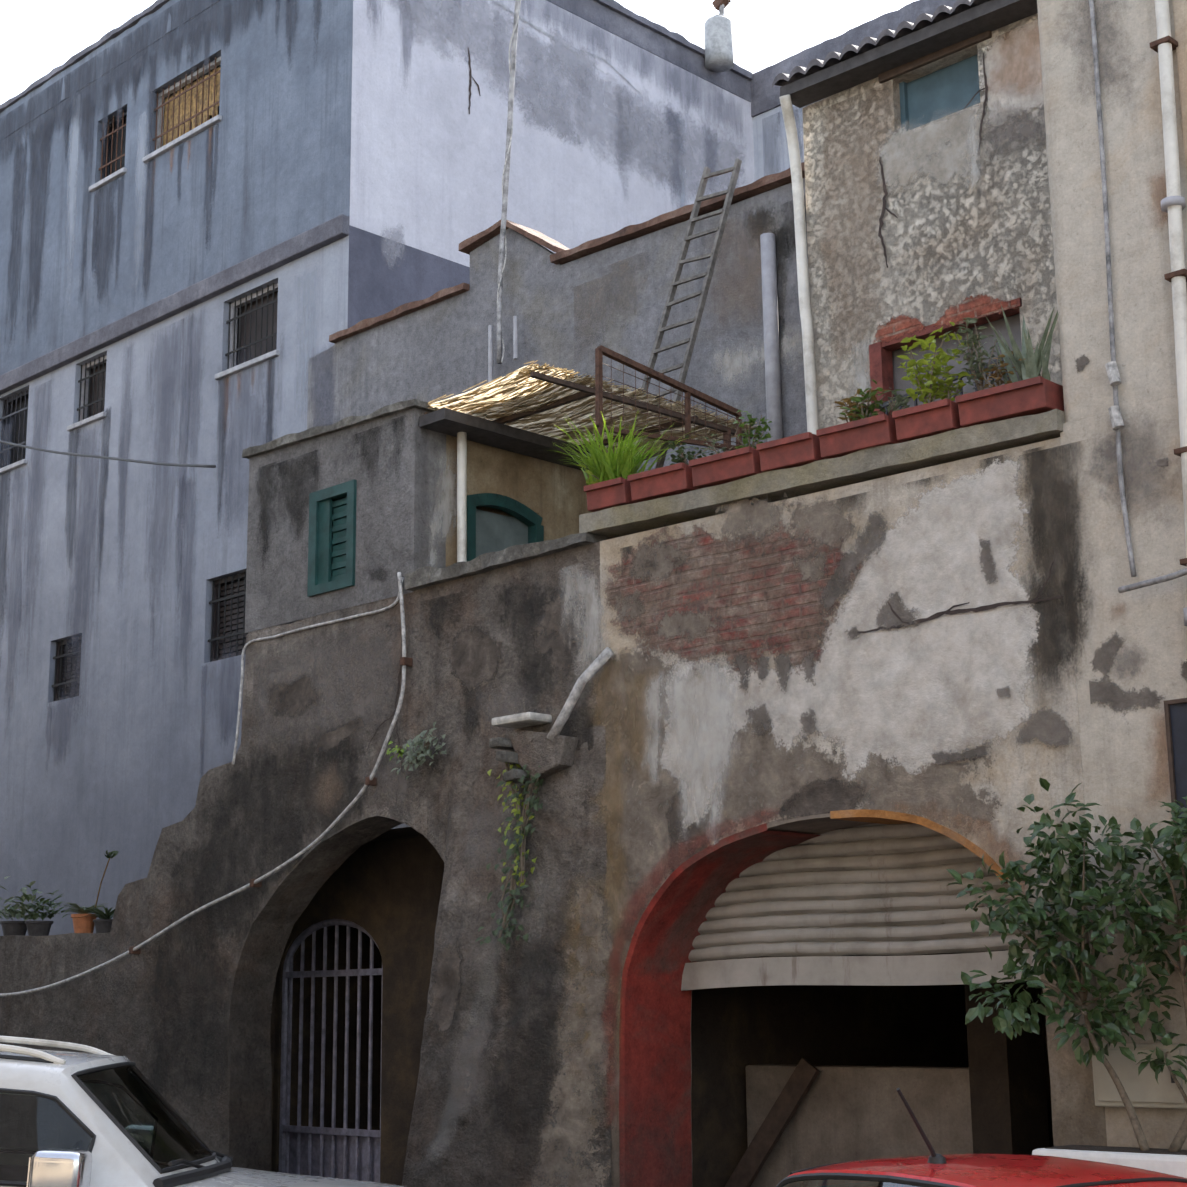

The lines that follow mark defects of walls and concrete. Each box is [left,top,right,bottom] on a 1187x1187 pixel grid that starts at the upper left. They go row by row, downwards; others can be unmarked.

crack [467,47,481,114]
crack [491,0,642,95]
crack [964,52,988,156]
water stain [0,0,262,332]
crack [878,157,898,268]
flaking render [874,293,1019,343]
water stain [219,376,228,505]
water stain [266,359,274,443]
water stain [257,450,318,553]
crack [858,562,1063,633]
water stain [1026,443,1086,686]
flaking render [525,493,1002,1187]